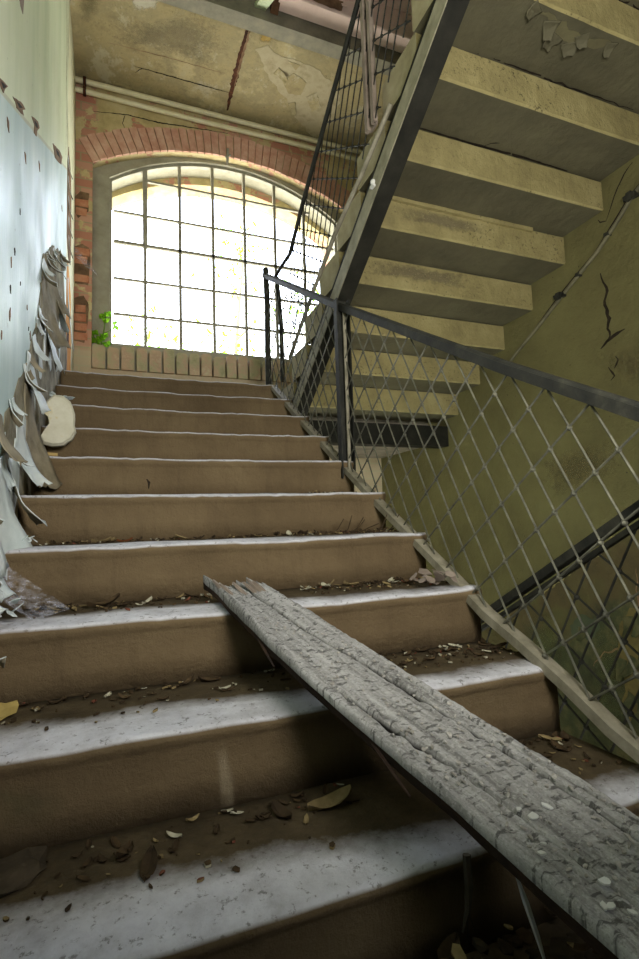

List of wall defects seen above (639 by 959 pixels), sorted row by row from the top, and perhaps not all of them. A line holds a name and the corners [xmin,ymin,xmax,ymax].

flaking render [0,78,40,137]
peeling [255,45,340,136]
crack [600,273,625,380]
peeling [0,144,90,617]